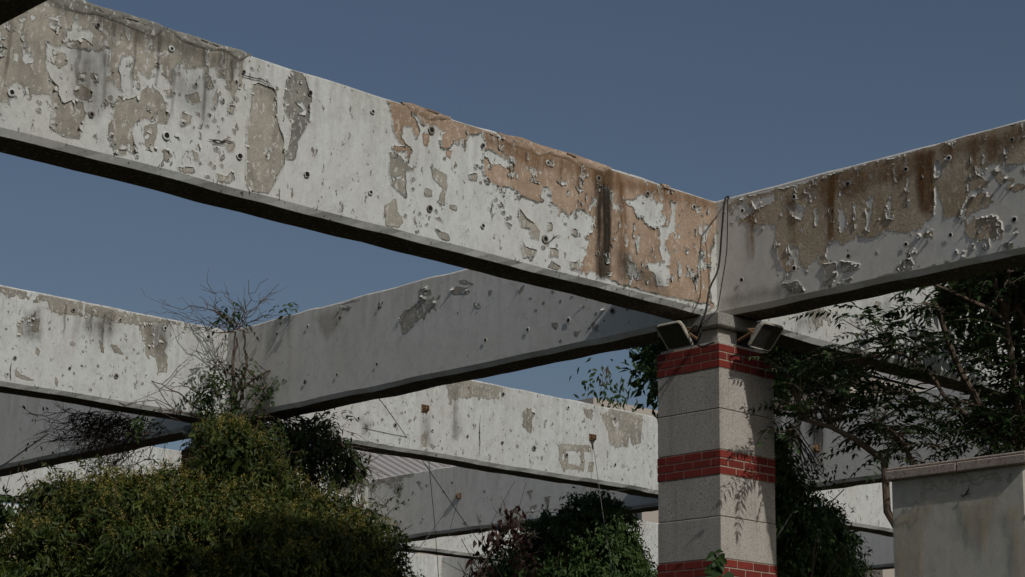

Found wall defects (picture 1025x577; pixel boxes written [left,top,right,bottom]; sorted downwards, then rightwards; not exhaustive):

peeling [0,0,313,194]
peeling [384,100,1025,310]
corrosion [917,151,934,210]
peeling [399,280,494,335]
peeling [446,381,503,405]
peeling [510,407,546,433]
peeling [541,442,594,472]
peeling [583,407,644,470]